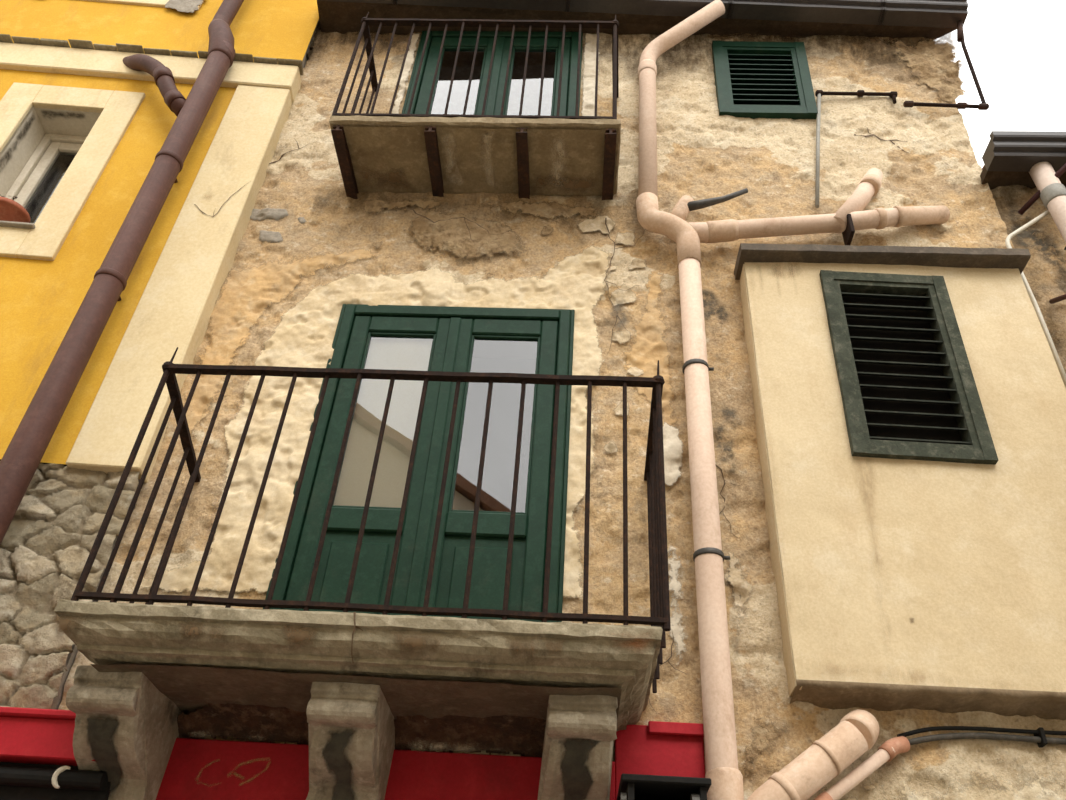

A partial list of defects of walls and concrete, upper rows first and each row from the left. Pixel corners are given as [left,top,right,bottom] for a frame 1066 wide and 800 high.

crack [854,126,911,154]
flaking render [250,208,307,243]
crack [604,218,645,351]
flaking render [140,216,646,599]
crack [716,465,740,538]